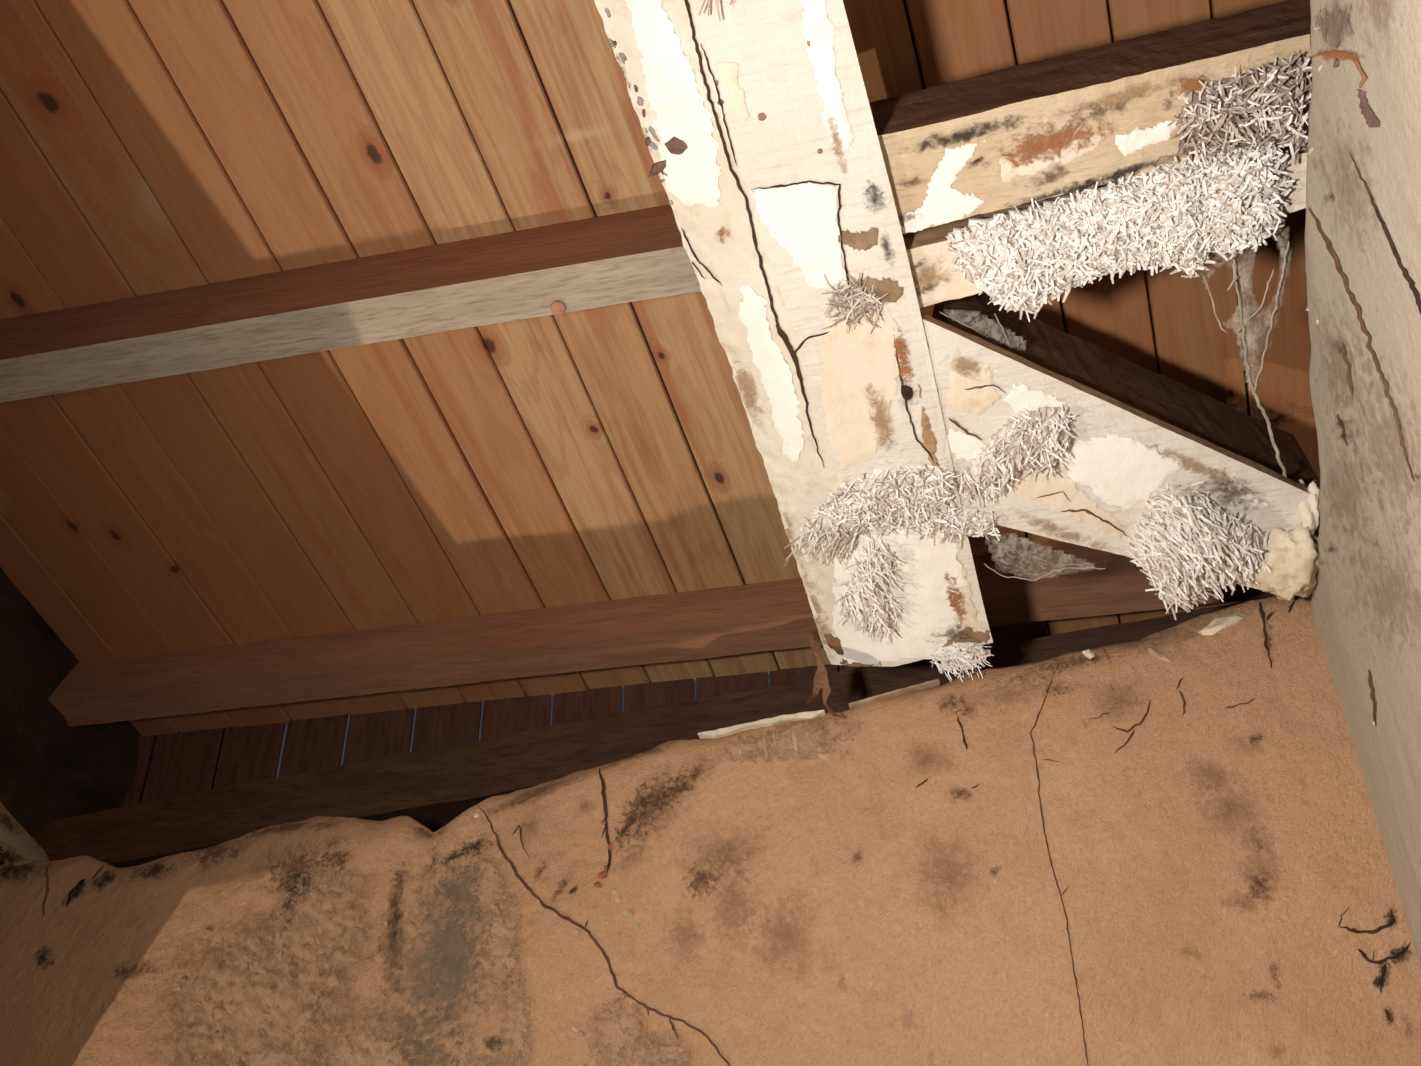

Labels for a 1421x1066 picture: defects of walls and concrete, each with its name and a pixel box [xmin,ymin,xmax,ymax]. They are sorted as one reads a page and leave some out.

peeling [838,227,879,251]
crack [1349,152,1421,315]
peeling [860,276,904,305]
crack [1308,208,1414,481]
peeling [918,384,941,467]
peeling [824,634,874,667]
peeling [942,627,990,648]
damp [0,813,49,879]
damp [69,870,115,898]
crack [474,768,730,1066]
crack [1030,668,1088,1066]
crack [1338,907,1410,1022]